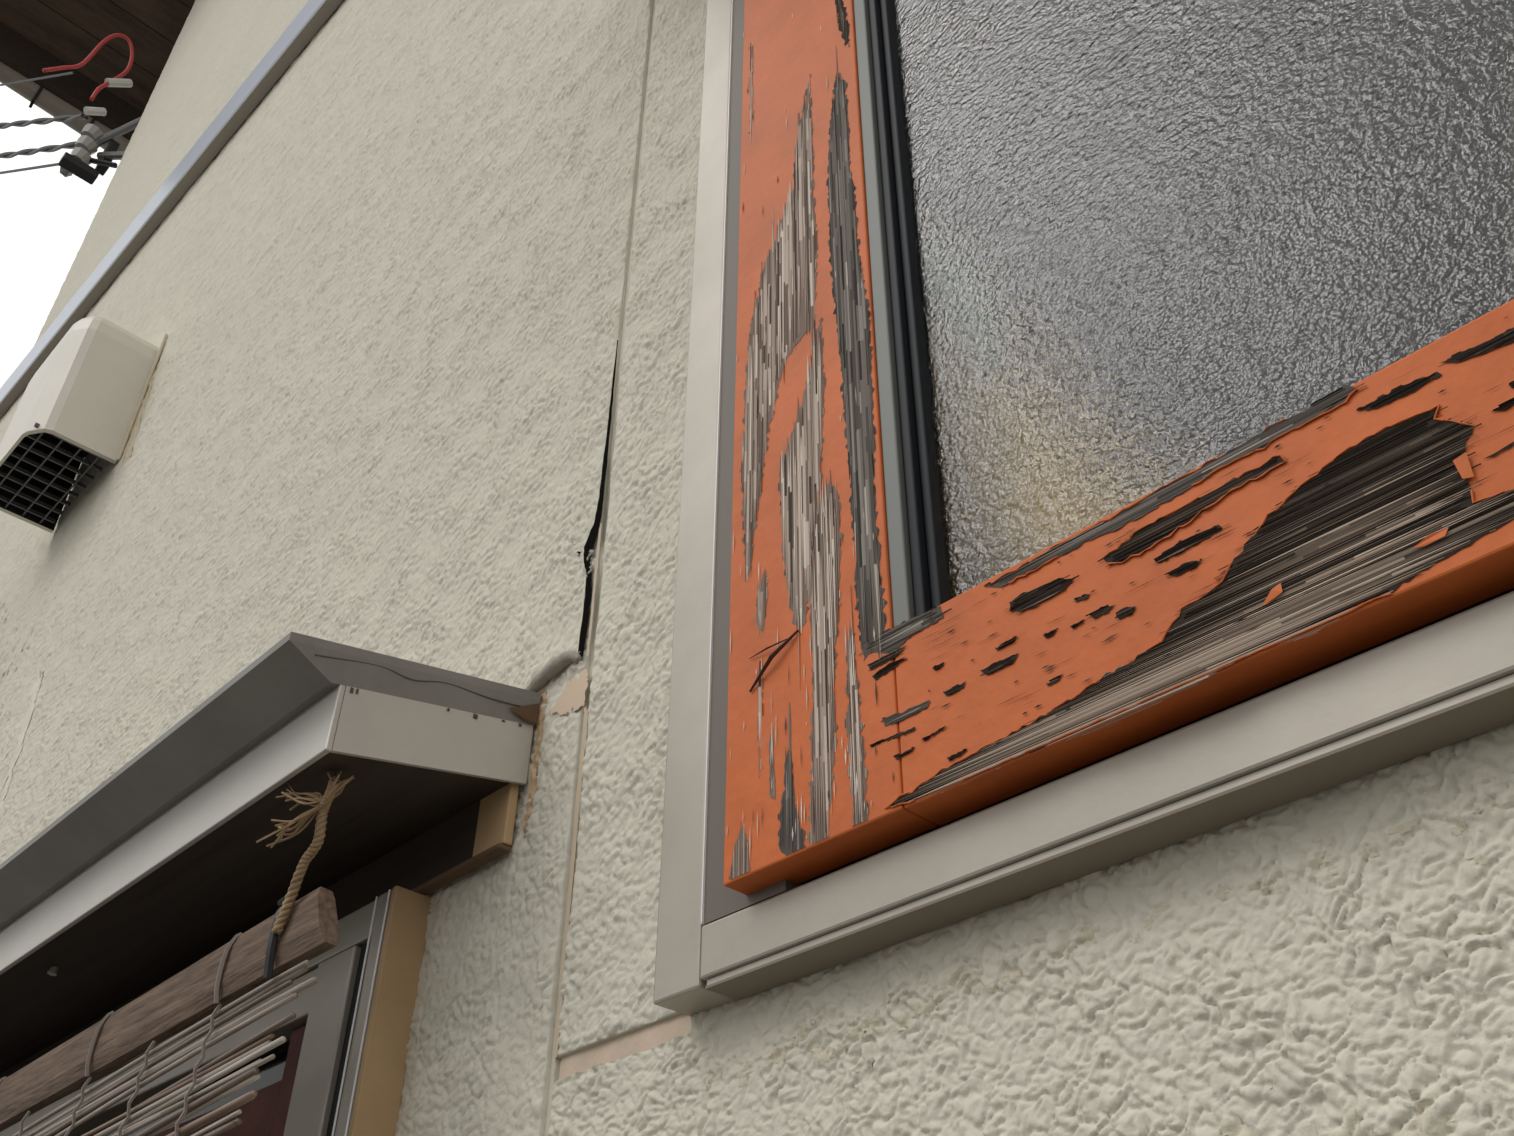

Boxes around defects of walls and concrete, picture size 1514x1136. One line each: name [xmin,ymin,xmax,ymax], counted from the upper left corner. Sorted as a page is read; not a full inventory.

crack [578,10,652,657]
peeling [733,0,1514,855]
peeling [729,811,758,879]